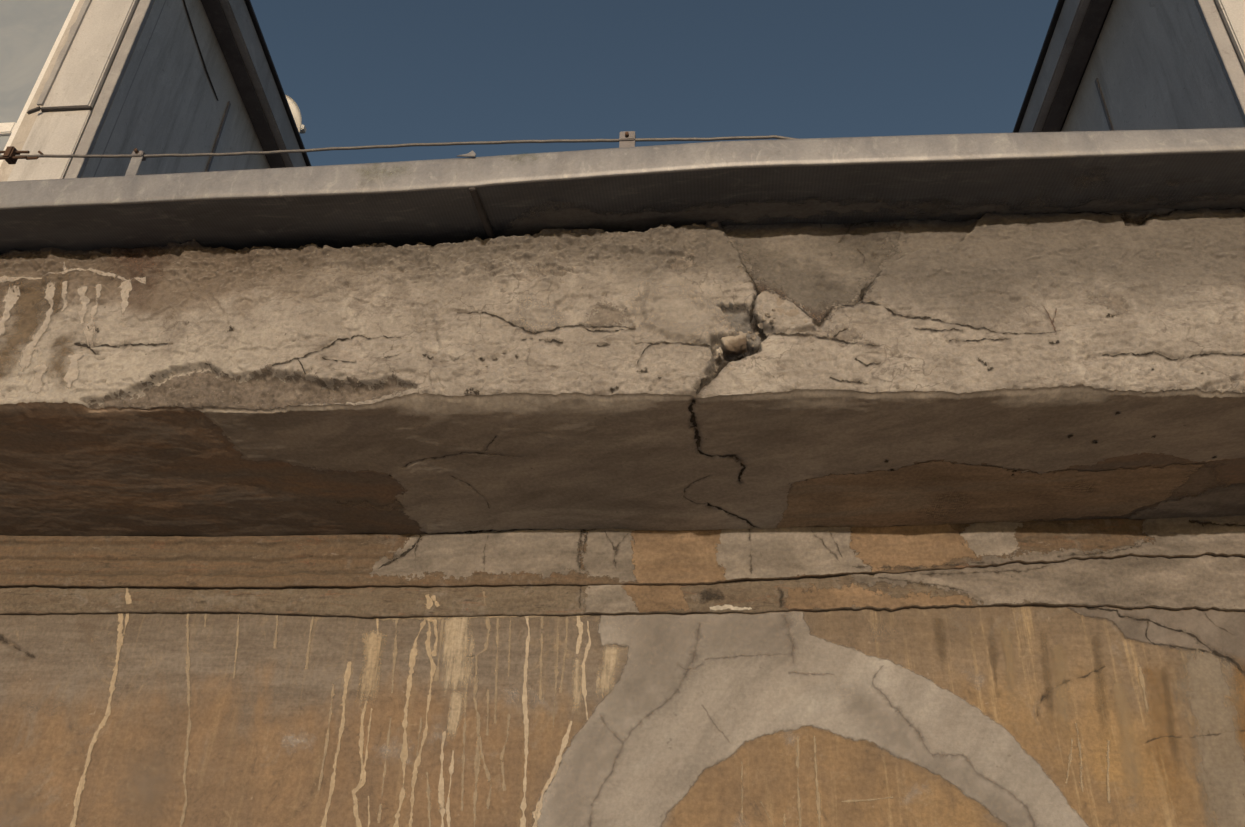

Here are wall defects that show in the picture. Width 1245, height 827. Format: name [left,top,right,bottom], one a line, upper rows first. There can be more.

leakage [0,262,146,393]
crack [74,343,169,354]
crack [272,335,399,374]
spalling [708,301,763,378]
crack [457,221,1060,574]
crack [1104,351,1245,360]
crack [381,436,532,567]
leakage [70,588,132,827]
leakage [180,613,192,827]
leakage [318,591,618,827]